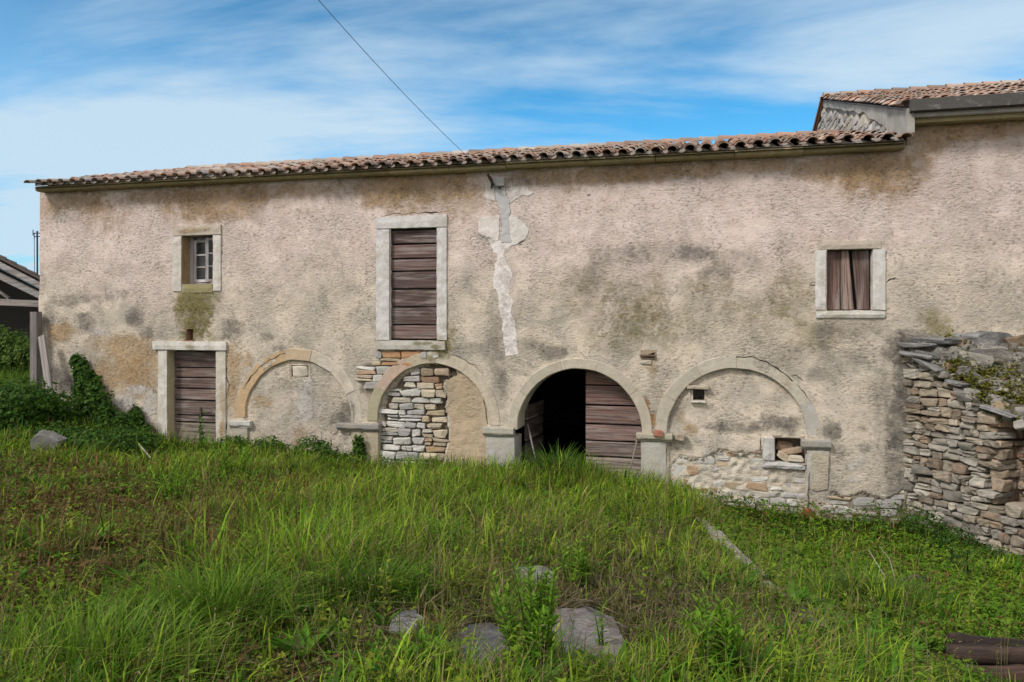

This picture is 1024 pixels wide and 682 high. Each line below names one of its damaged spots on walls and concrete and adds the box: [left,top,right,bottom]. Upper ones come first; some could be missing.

flaking render [478,180,533,356]
leakage [173,292,219,347]
crack [725,356,808,398]
flaking render [670,449,913,523]